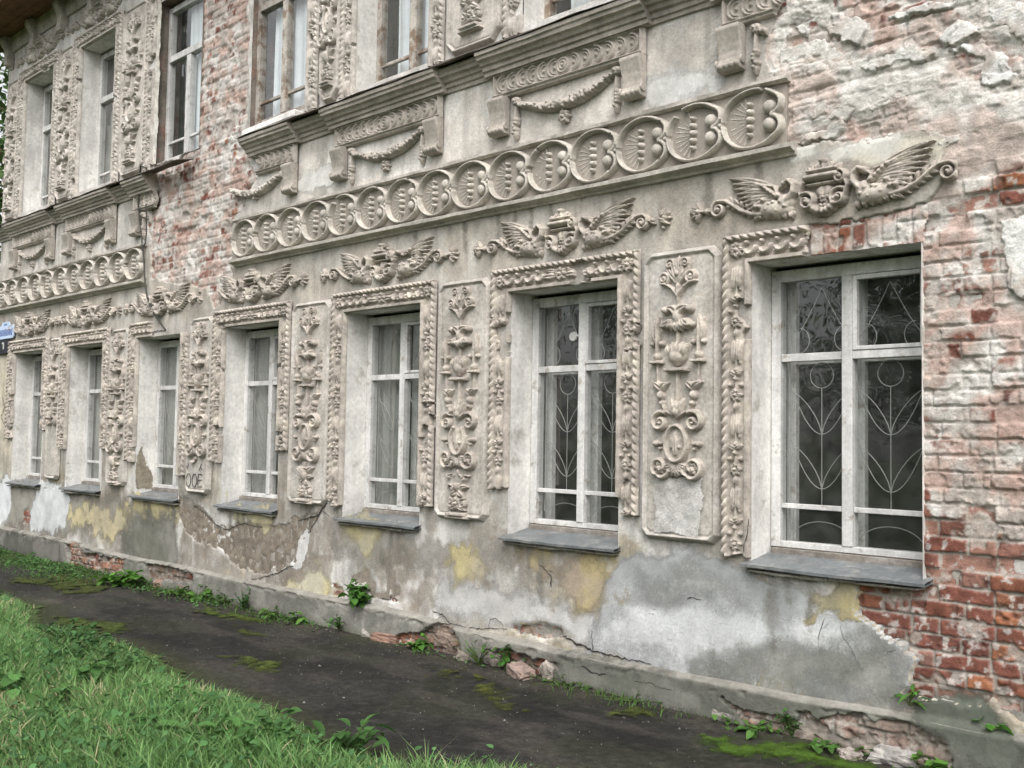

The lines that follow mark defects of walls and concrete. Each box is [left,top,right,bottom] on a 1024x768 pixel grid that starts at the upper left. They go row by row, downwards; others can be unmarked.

spalling [148,0,257,308]
spalling [766,0,1024,713]
peeling [135,446,153,489]
leakage [3,463,214,573]
crack [193,504,263,543]
peeling [177,493,317,574]
crack [299,503,329,533]
leakage [331,515,544,602]
crack [432,610,506,630]
spalling [513,623,565,639]
crack [564,630,670,690]